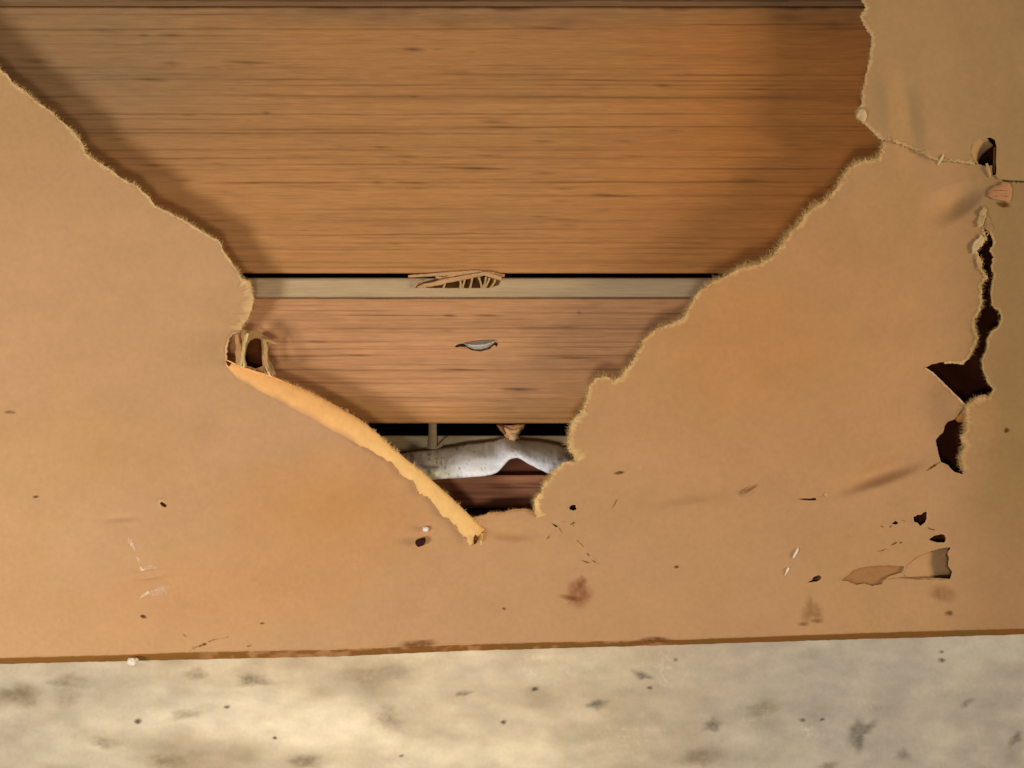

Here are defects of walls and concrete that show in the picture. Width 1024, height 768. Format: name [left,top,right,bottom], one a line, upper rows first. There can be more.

peeling [856,108,877,137]
spalling [416,277,500,288]
peeling [839,563,906,588]